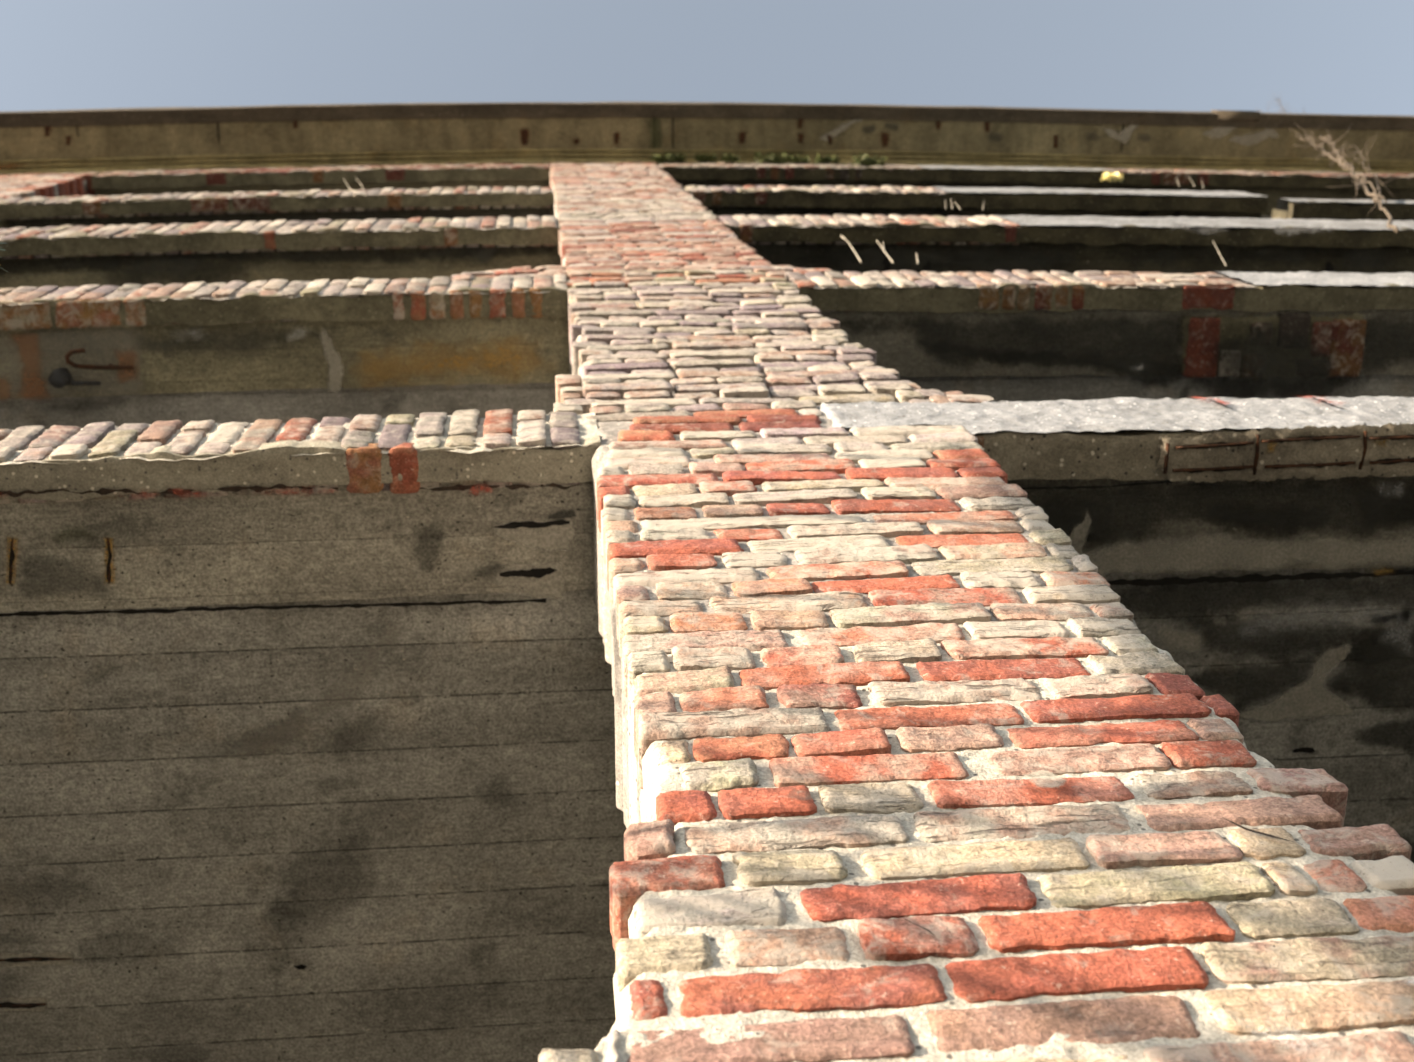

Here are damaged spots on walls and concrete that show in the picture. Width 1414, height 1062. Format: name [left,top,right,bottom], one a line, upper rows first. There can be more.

spalling [1180,284,1367,379]
spalling [1159,422,1414,483]
leakage [1024,476,1414,753]